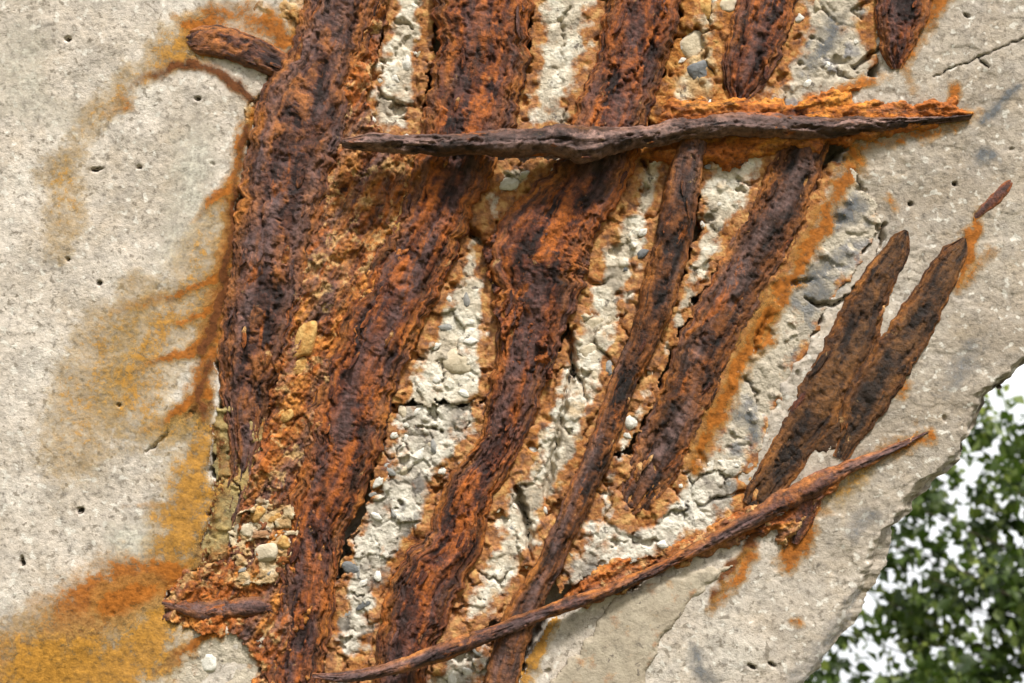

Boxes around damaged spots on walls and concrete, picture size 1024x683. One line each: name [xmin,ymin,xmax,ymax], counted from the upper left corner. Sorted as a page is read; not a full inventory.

spalling [366,0,437,135]
spalling [514,0,607,129]
spalling [747,0,878,106]
rust [0,0,303,683]
spalling [321,157,560,683]
spalling [435,154,669,645]
spalling [555,154,882,594]
rust [688,82,976,475]
rust [955,217,990,292]
rust [710,533,759,609]
rust [778,502,826,573]
rust [519,616,560,683]